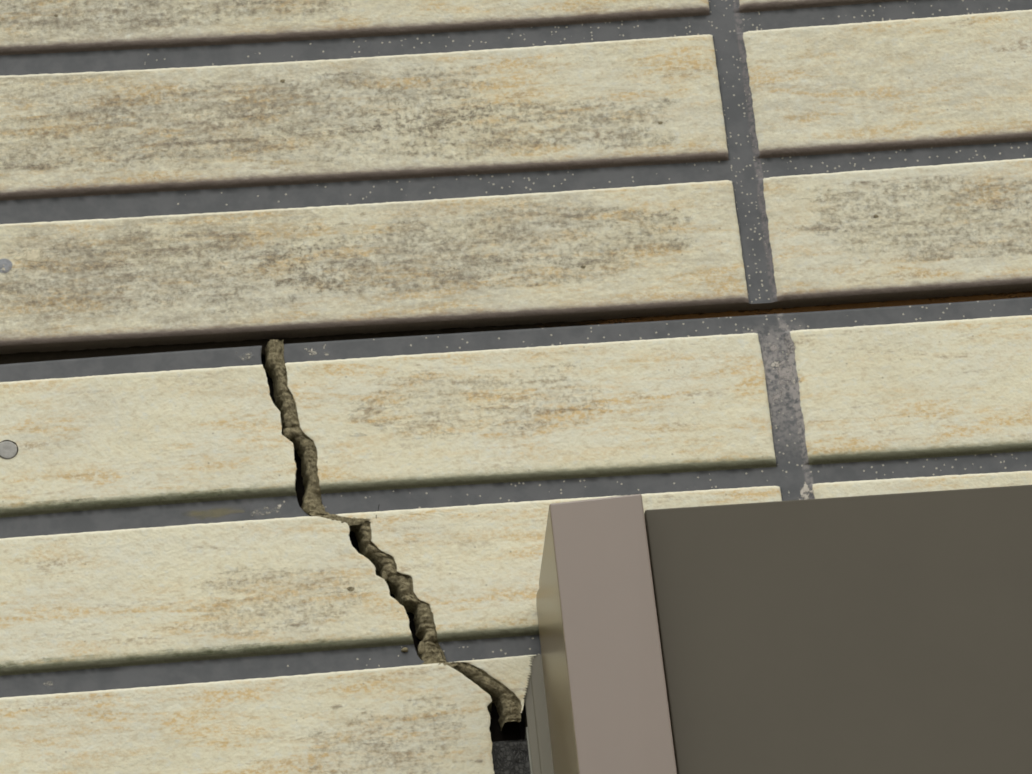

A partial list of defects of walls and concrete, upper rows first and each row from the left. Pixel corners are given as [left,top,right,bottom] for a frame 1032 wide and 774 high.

crack [261,339,522,742]